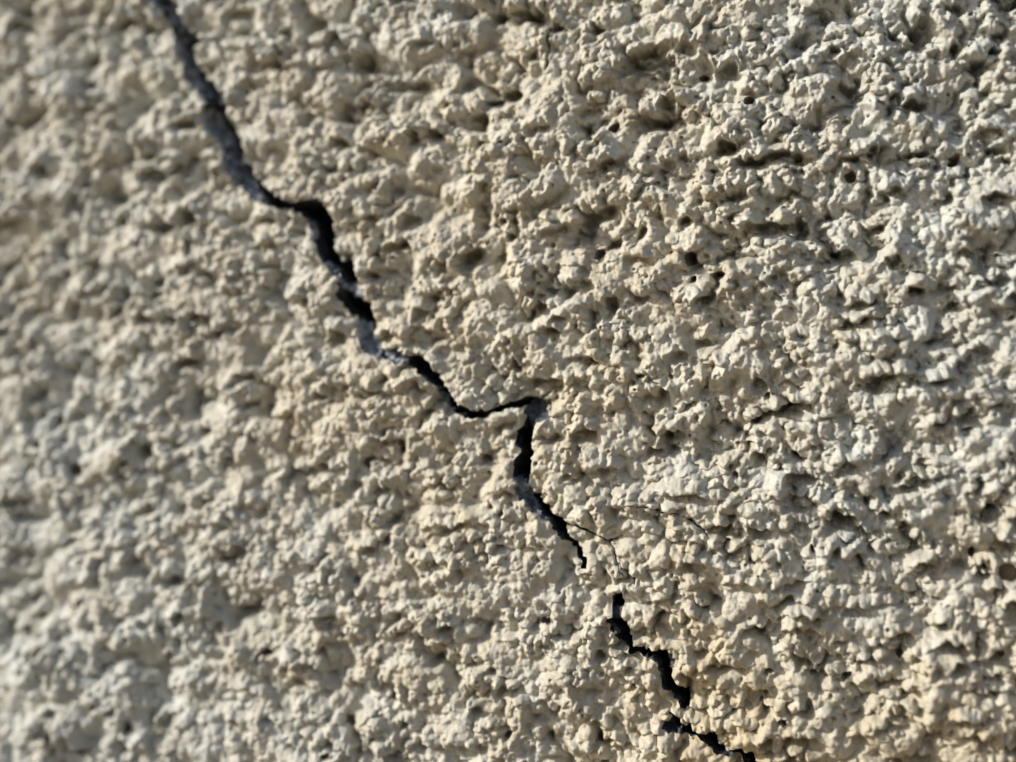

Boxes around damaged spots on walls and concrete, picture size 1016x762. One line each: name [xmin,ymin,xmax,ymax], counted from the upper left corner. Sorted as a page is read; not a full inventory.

crack [152,0,757,762]